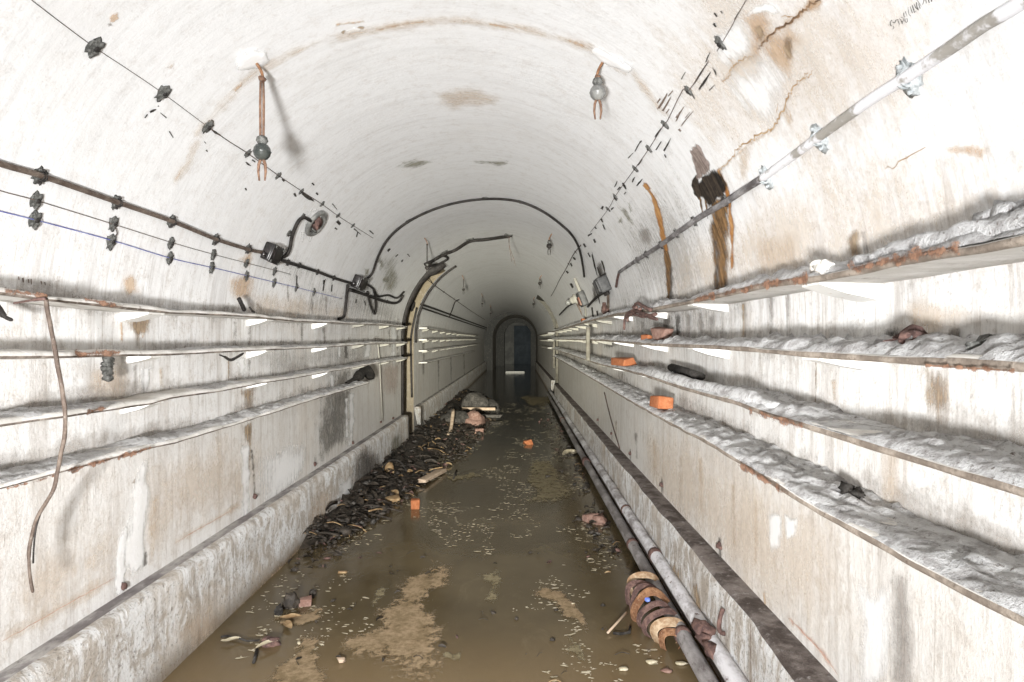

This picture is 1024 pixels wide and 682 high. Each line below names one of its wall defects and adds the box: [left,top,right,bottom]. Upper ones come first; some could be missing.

crack [718,0,820,171]
rust [643,183,673,299]
rust [717,169,734,269]
rust [847,232,960,273]
leakage [320,372,379,500]